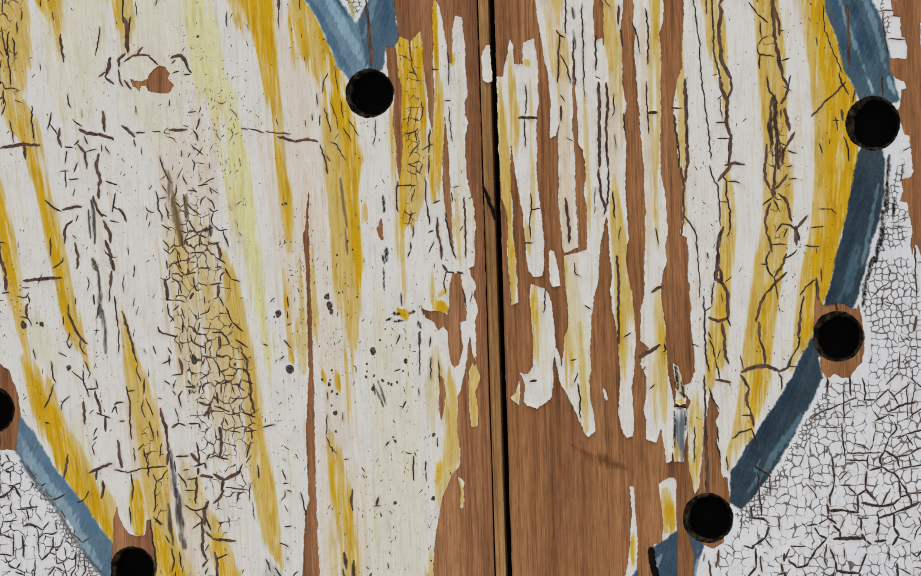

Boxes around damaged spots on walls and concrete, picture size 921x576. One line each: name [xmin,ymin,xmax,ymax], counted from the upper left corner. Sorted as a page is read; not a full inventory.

peeling [130,66,174,94]
crack [0,0,382,576]
peeling [302,193,320,576]
crack [394,331,440,408]
crack [396,52,496,306]
crack [519,86,538,147]
crack [525,193,540,244]
peeling [386,0,730,576]
crack [571,359,581,418]
crack [556,3,631,344]